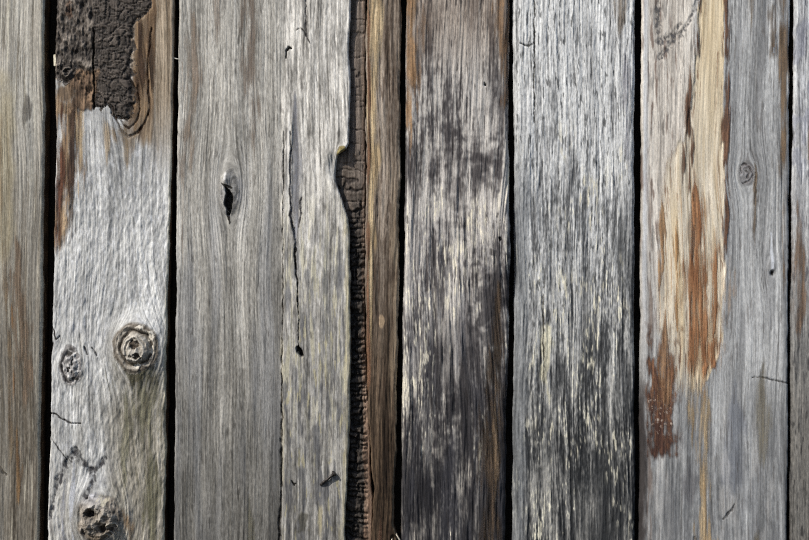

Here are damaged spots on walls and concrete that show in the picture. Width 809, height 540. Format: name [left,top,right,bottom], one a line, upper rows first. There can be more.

crack [278,139,304,540]